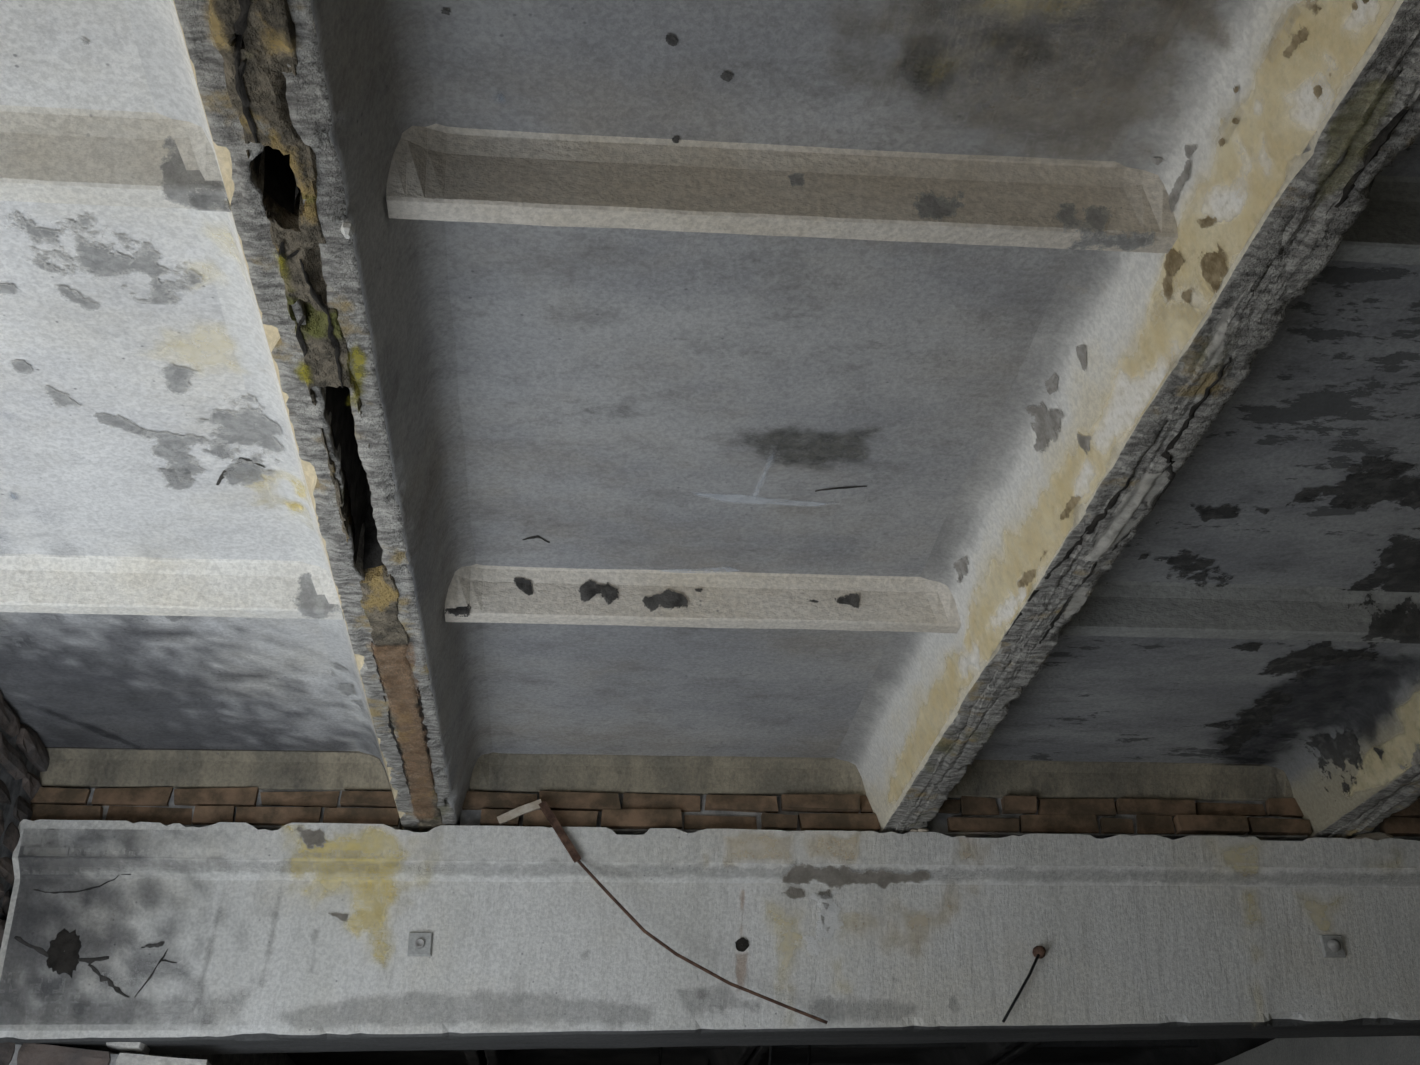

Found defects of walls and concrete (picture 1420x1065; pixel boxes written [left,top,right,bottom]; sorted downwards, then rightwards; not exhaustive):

peeling [157,136,231,212]
spalling [258,146,299,214]
peeling [1056,202,1227,303]
spalling [326,386,384,569]
damp [756,430,876,465]
damp [889,0,1391,800]
peeling [578,579,619,605]
peeling [642,588,703,612]
peeling [1204,527,1420,755]
damp [1348,693,1420,796]
damp [292,830,402,959]
crack [14,936,177,998]